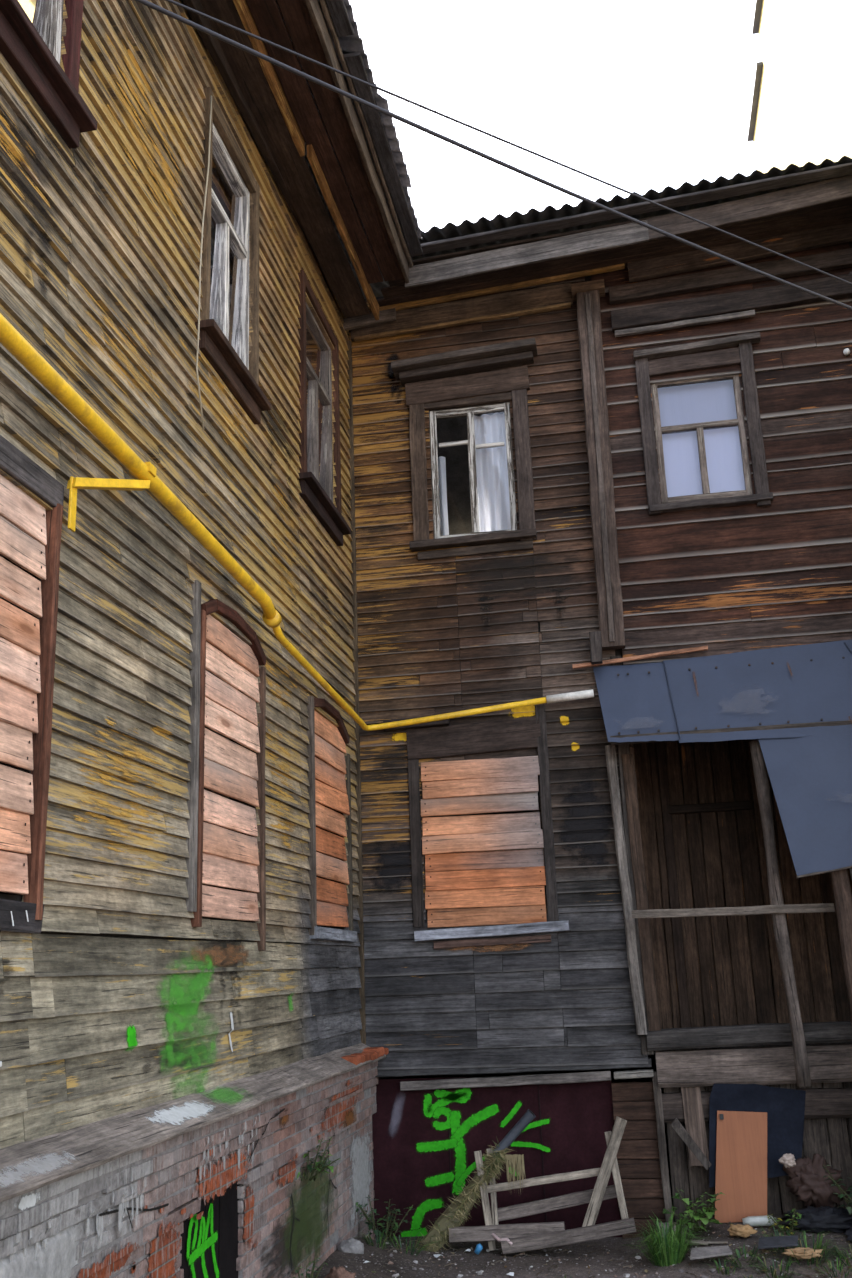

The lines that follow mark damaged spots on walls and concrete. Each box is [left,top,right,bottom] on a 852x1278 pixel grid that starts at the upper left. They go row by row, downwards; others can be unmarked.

flaking render [310,1047,389,1139]
flaking render [77,1147,258,1278]
leakage [262,1212,313,1278]
spalling [325,1266,356,1278]